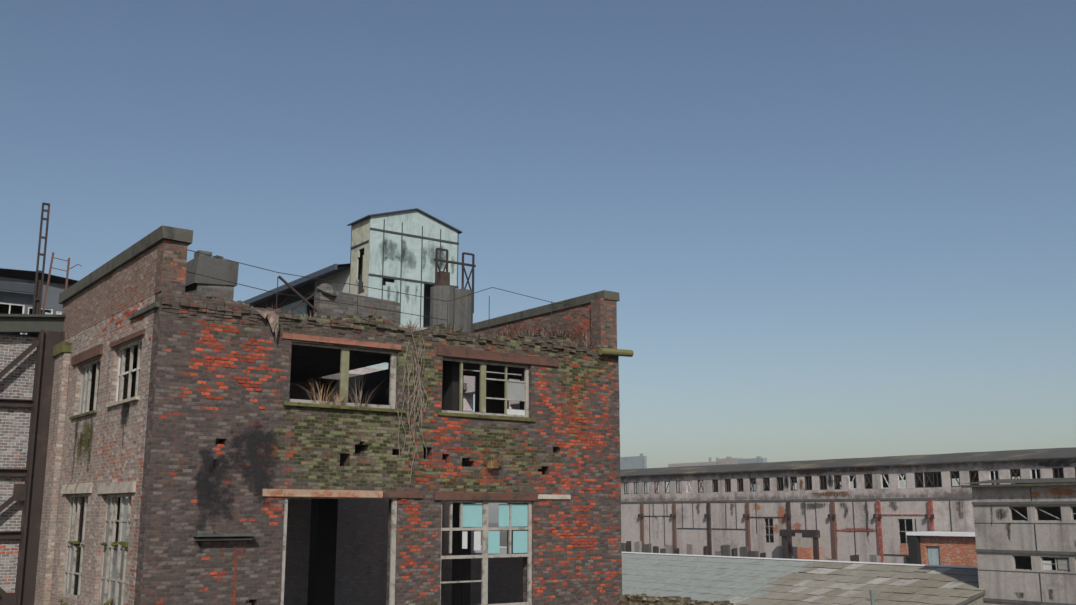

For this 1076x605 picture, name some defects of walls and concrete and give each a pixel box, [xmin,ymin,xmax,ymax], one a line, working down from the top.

water stain [196,450,234,552]